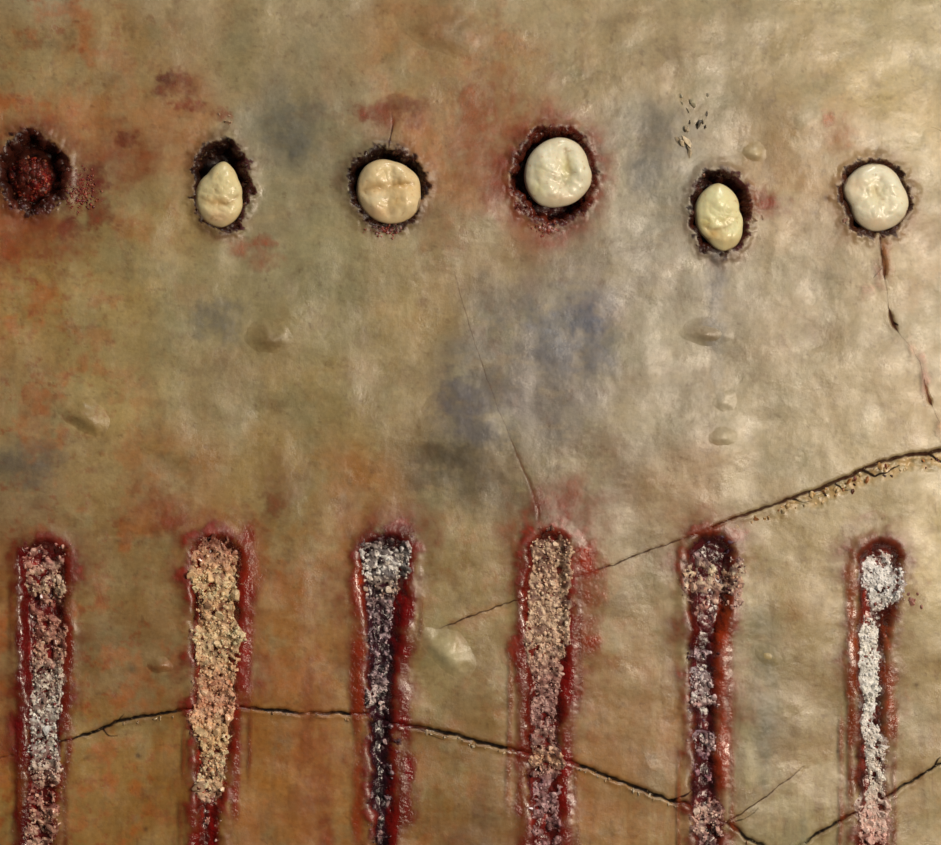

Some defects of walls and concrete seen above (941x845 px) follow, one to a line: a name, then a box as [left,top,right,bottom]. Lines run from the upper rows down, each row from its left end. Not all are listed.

spalling [0,128,72,218]
corrosion [500,110,607,239]
crack [714,309,941,528]
corrosion [6,531,85,845]
crack [59,708,187,742]
corrosion [173,520,264,815]
corrosion [341,516,425,845]
crack [408,724,528,755]
corrosion [507,517,601,845]
crack [572,760,691,808]
corrosion [835,532,916,793]
crack [884,758,941,799]